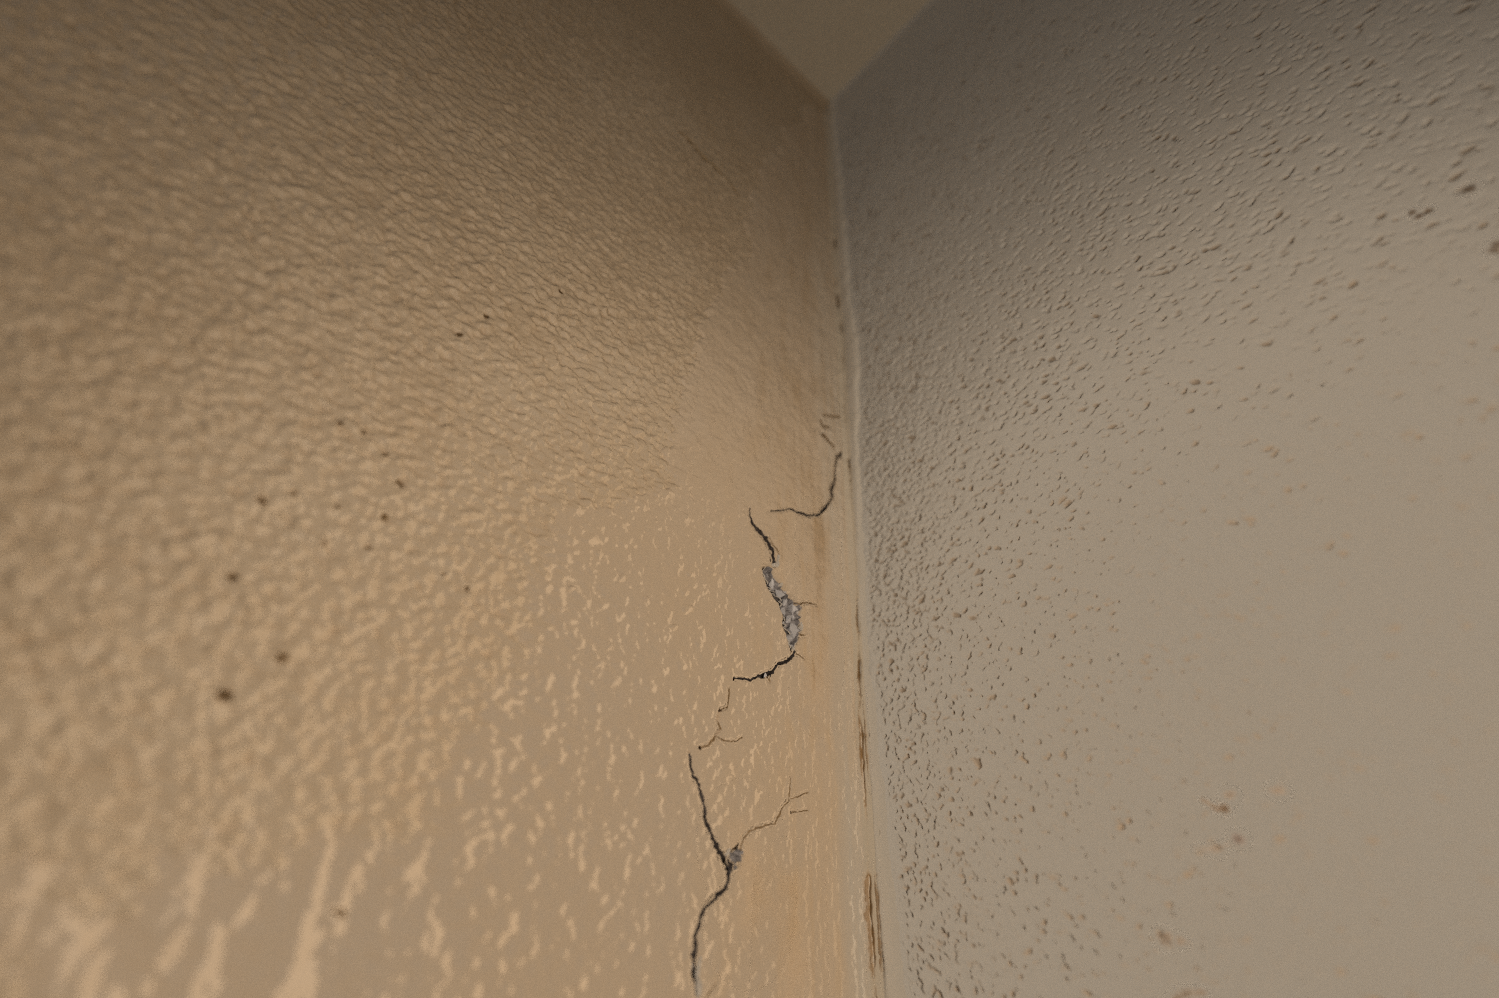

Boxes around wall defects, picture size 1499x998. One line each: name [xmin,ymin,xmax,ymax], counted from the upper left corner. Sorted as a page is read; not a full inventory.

crack [687,414,842,998]